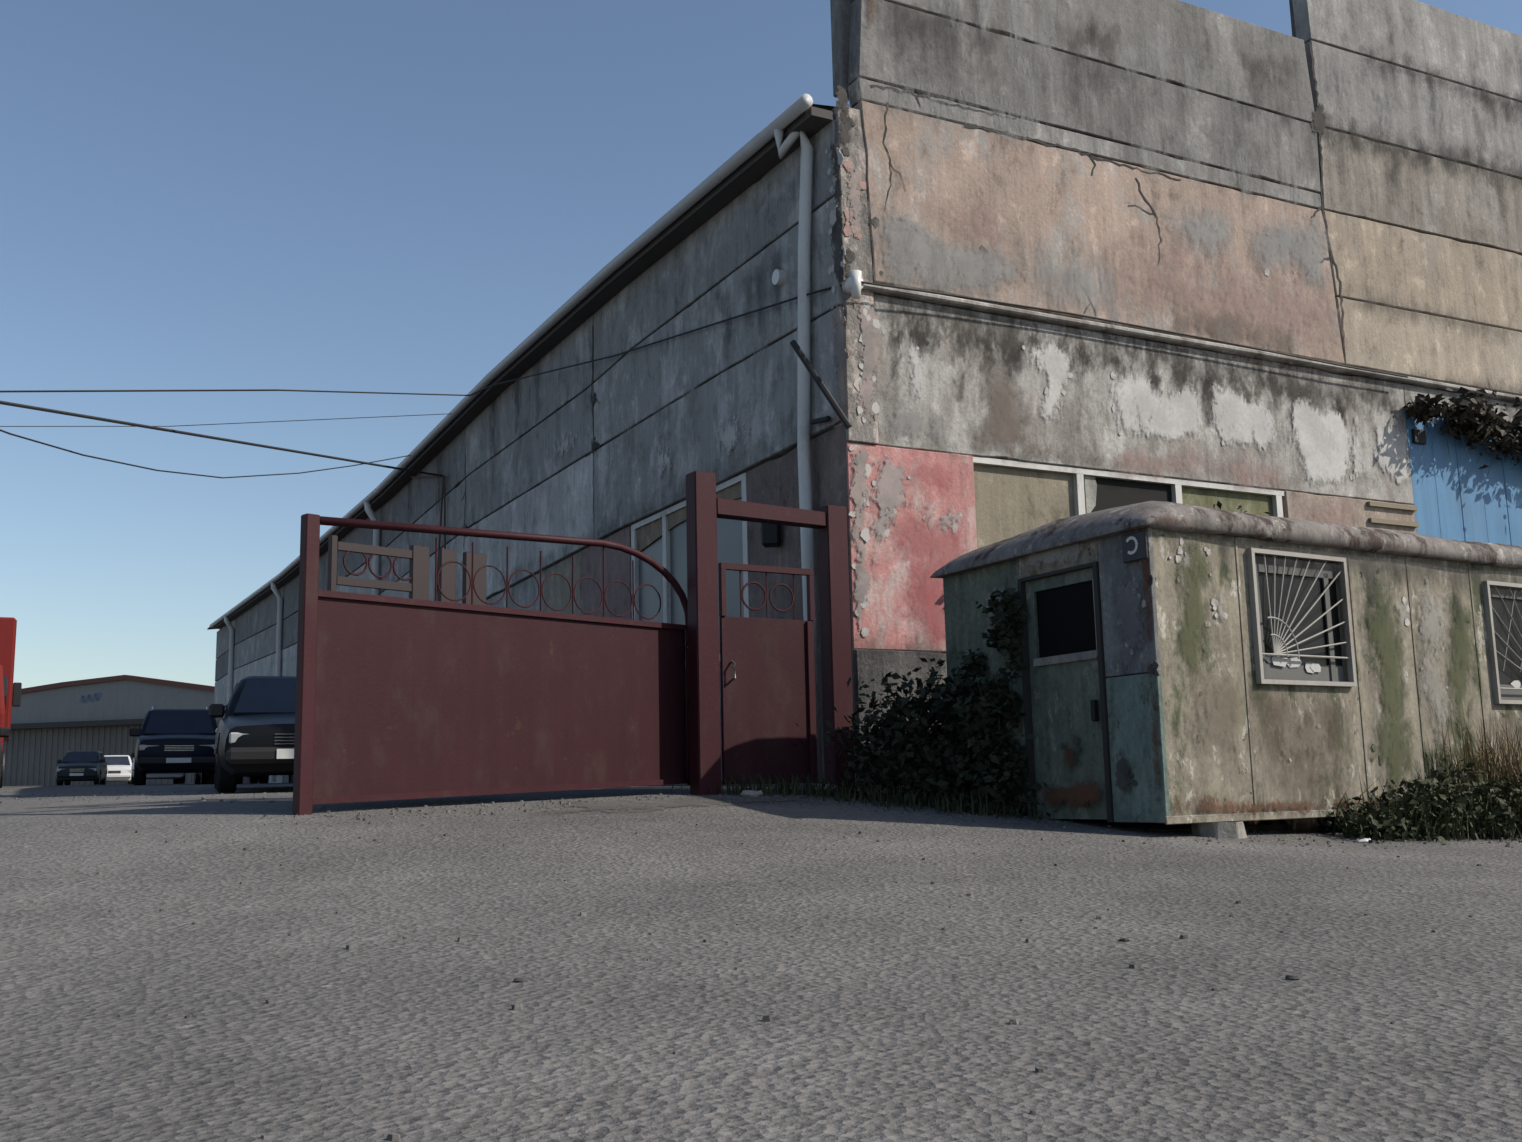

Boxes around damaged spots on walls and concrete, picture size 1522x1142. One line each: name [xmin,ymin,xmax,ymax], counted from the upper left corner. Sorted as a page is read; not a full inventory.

crack [871,85,1181,265]
crack [1306,43,1346,356]
leakage [891,305,1391,428]
peeling [848,445,965,640]
corrosion [1140,558,1153,640]
corrosion [1147,660,1160,677]
corrosion [1115,695,1398,816]